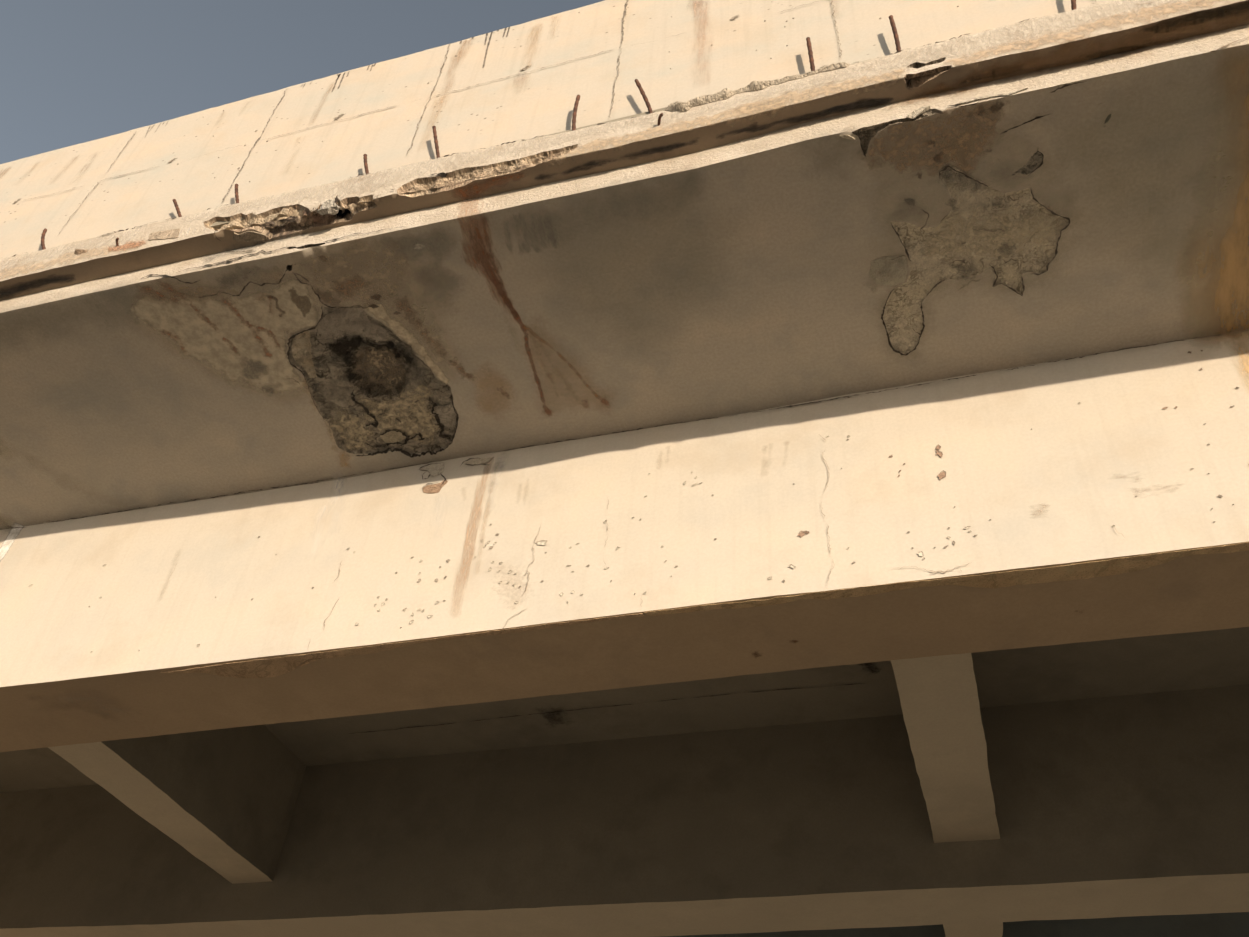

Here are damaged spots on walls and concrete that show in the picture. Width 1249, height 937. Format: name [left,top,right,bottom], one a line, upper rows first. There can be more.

rust [456,175,523,198]
spalling [199,0,1214,239]
damp [0,277,73,298]
peeling [134,246,468,494]
rust [461,218,608,413]